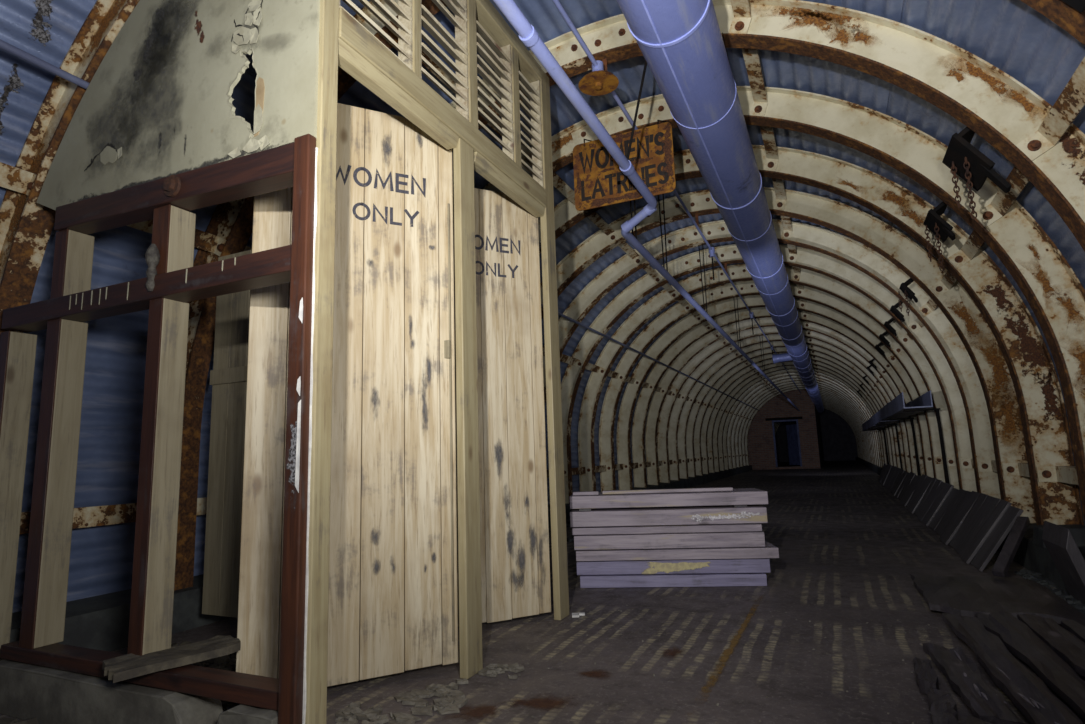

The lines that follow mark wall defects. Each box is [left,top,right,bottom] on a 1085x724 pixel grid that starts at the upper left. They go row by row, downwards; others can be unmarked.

rust [29,0,54,46]
rust [83,0,127,60]
rust [774,6,871,45]
rust [0,64,24,136]
water stain [89,0,196,167]
spalling [226,0,270,158]
rust [947,58,1039,114]
rust [1059,132,1085,185]
rust [0,193,27,263]
rust [1029,245,1084,323]
rust [948,284,1063,445]
rust [1070,342,1085,399]